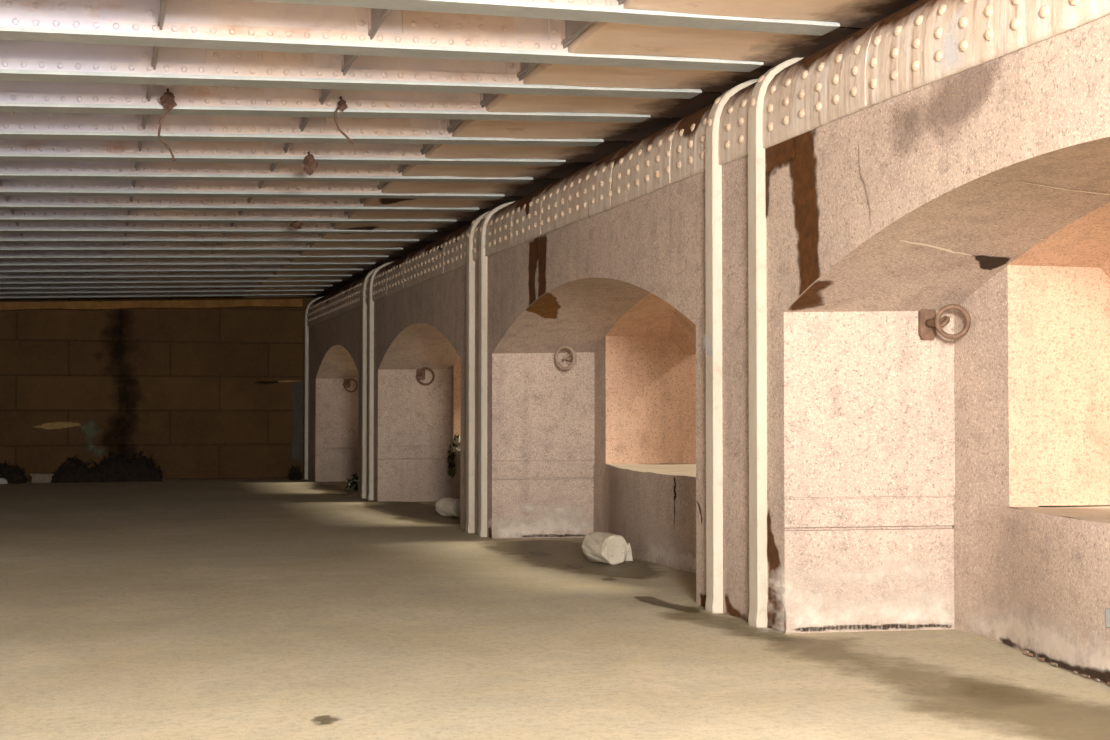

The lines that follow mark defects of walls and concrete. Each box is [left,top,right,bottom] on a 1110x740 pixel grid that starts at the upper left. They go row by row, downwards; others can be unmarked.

corrosion [526,235,561,319]
corrosion [765,129,832,310]
crack [674,477,702,524]
corrosion [767,512,786,633]
water stain [636,584,1110,740]